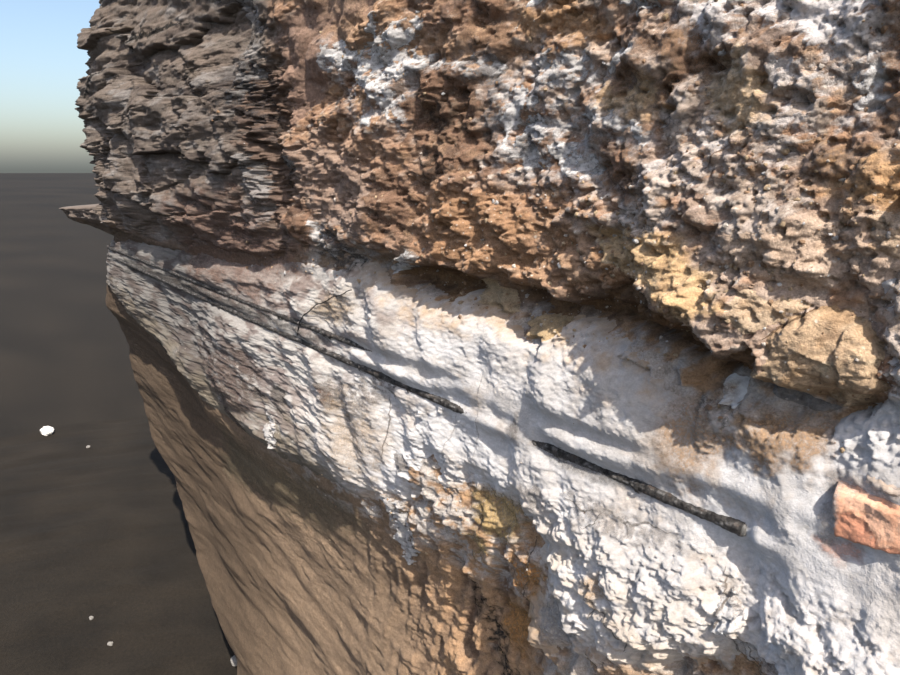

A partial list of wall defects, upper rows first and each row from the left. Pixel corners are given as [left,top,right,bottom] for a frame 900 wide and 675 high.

spalling [636,12,726,103]
spalling [393,47,491,172]
spalling [361,169,421,245]
spalling [395,265,487,302]
spalling [544,280,710,352]
spalling [719,348,757,371]
crack [762,308,818,340]
leakage [379,494,421,565]
leakage [473,582,517,675]
leakage [538,602,573,641]
crack [587,603,627,653]
crack [713,566,760,668]